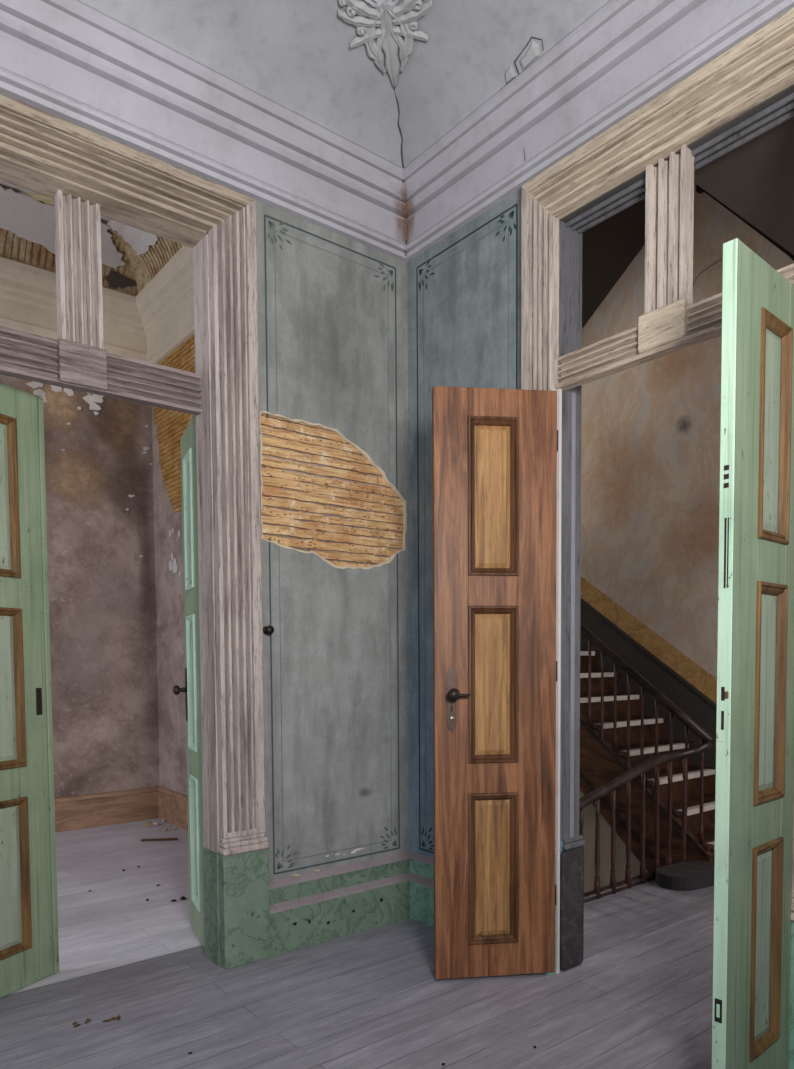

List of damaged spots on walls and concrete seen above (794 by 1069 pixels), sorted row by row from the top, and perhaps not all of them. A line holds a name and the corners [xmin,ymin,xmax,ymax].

peeling [0,185,55,254]
peeling [101,219,159,289]
crack [394,88,408,256]
flaking render [158,334,195,373]
flaking render [26,381,194,513]
flaking render [260,411,407,569]